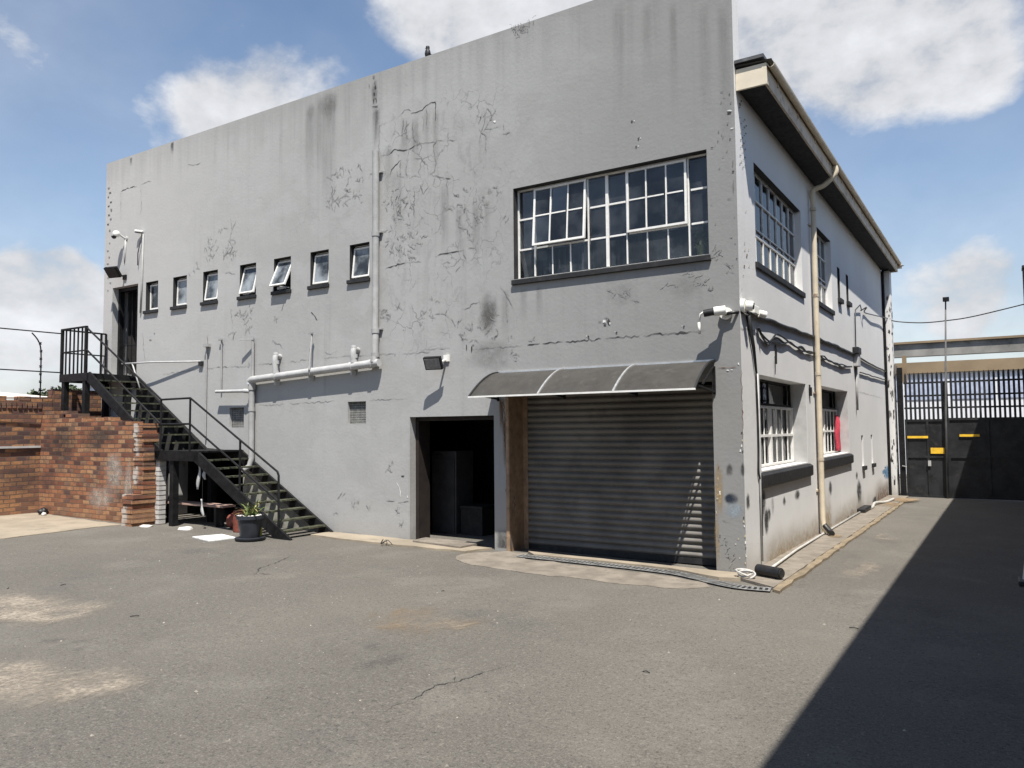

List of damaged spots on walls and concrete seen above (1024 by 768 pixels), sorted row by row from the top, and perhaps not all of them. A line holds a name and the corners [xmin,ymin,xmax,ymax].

crack [378,102,454,218]
crack [480,330,704,349]